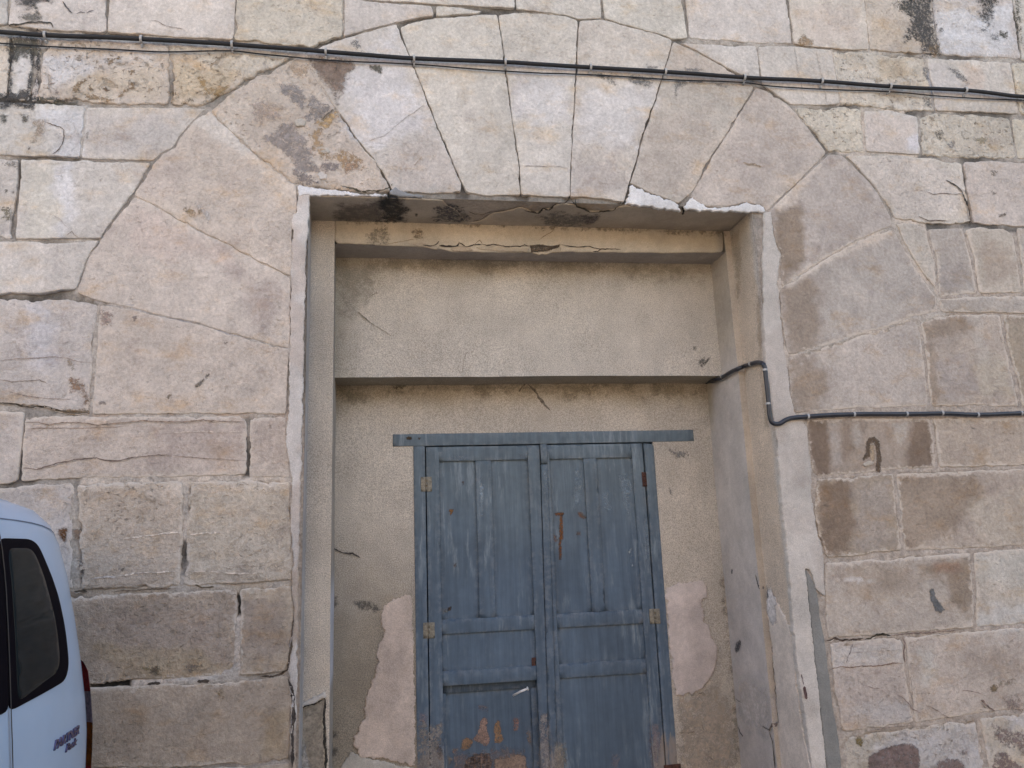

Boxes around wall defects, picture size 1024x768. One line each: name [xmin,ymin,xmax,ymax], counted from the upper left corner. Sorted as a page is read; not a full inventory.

leakage [897,0,943,79]
leakage [978,0,1022,41]
leakage [0,36,74,143]
leakage [334,194,418,245]
leakage [433,204,480,226]
crack [389,198,622,252]